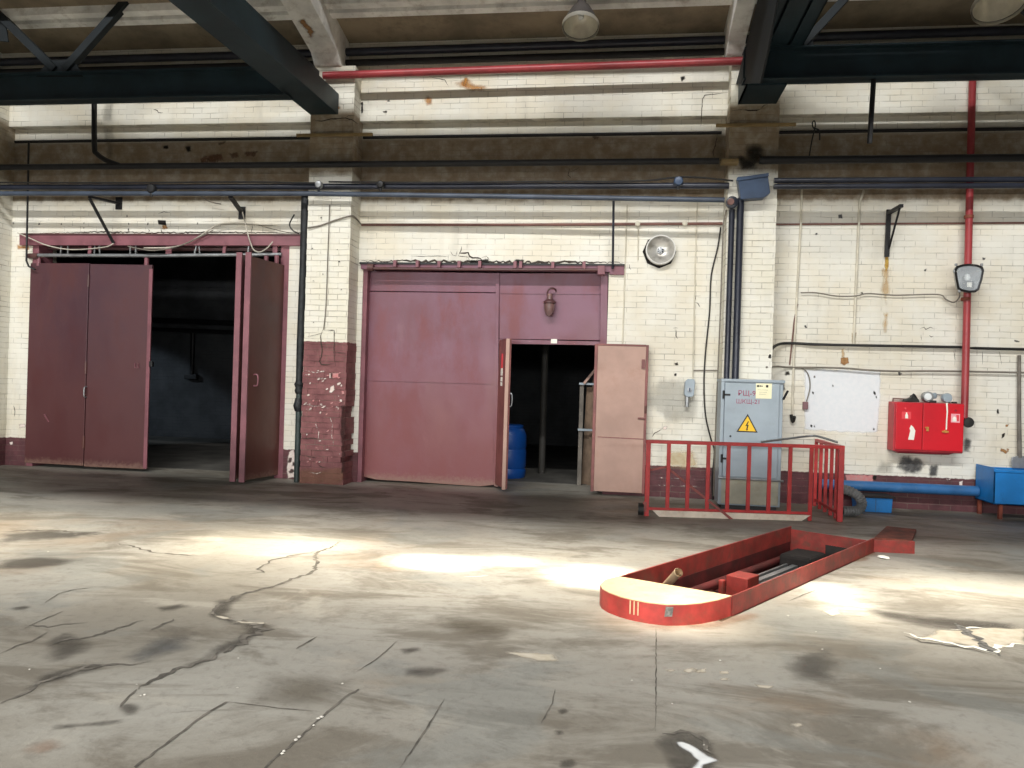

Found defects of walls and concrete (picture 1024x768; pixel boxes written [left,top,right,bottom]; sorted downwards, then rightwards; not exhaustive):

corrosion [461,78,484,90]
spalling [303,370,346,474]
crack [4,530,190,567]
crack [1,543,338,706]
spalling [904,623,1024,655]